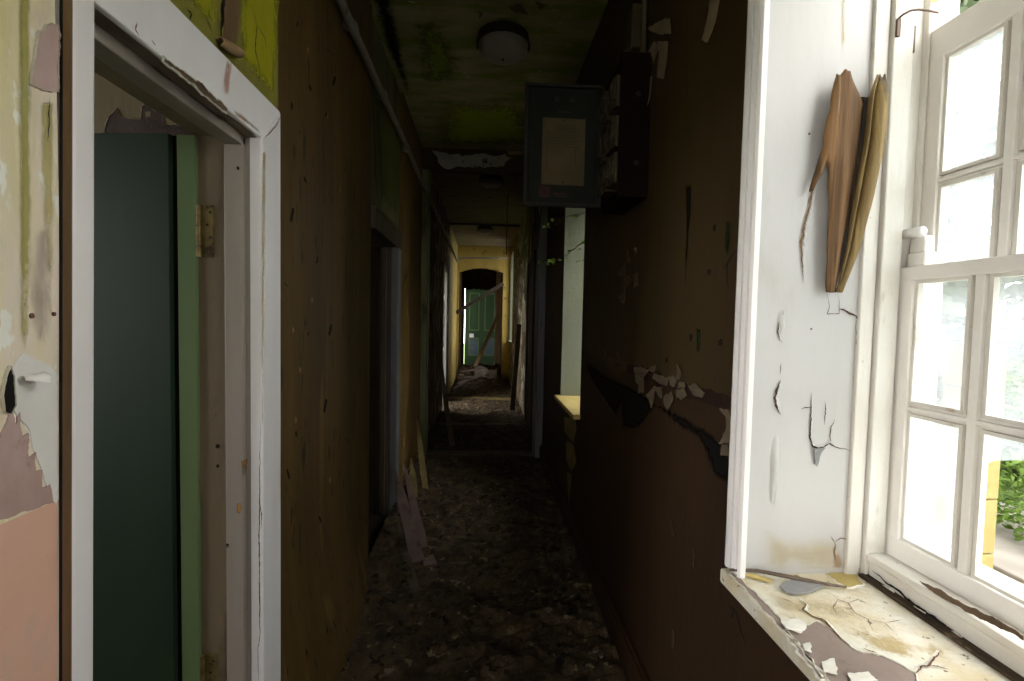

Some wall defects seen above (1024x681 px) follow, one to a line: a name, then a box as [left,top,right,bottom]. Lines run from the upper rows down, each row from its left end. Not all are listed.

flaking render [29,23,61,93]
flaking render [104,104,193,136]
peeling [162,55,228,115]
mould [374,0,408,89]
flaking render [433,151,512,169]
peeling [648,18,671,79]
peeling [0,353,58,520]
peeling [628,357,731,456]
crack [773,380,851,466]
peeling [729,572,919,681]
crack [782,572,953,675]
peeling [920,581,1024,640]